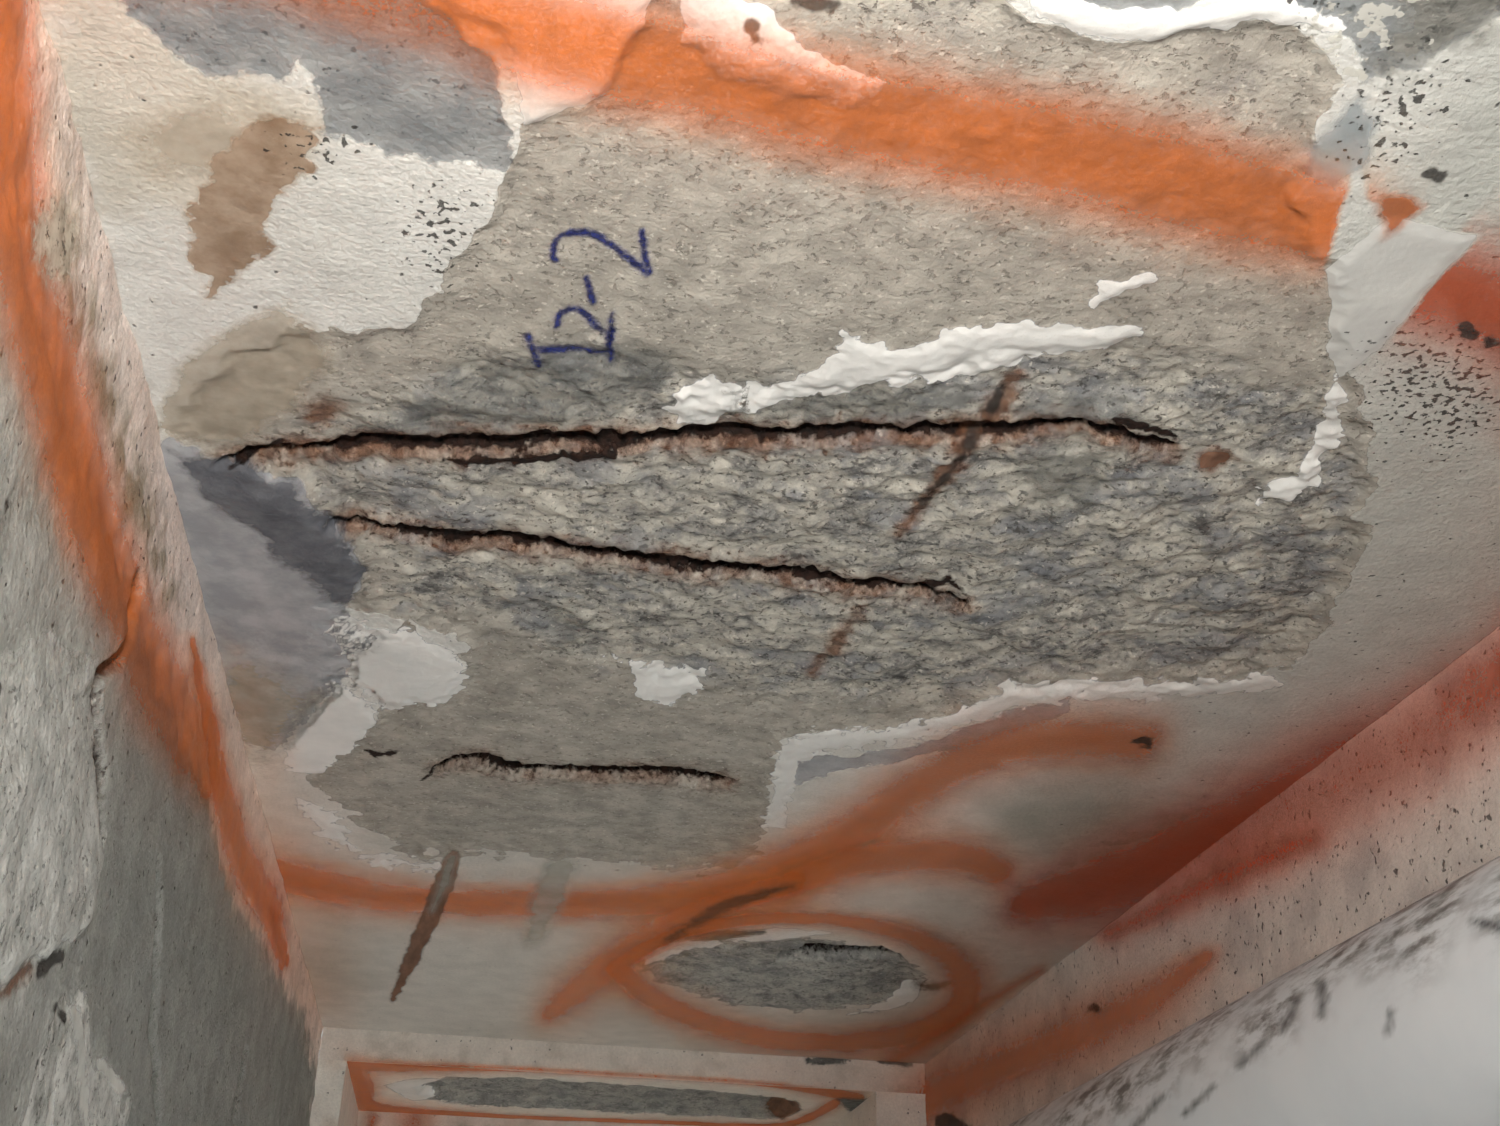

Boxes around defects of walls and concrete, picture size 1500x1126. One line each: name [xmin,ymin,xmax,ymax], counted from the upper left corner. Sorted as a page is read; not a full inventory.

spalling [35,200,78,276]
leakage [154,116,321,298]
crack [217,416,1180,470]
spalling [124,0,1500,876]
rust [898,370,1025,537]
crack [332,510,969,610]
rust [809,612,859,675]
crack [89,652,118,799]
crack [364,749,397,758]
crack [421,752,733,784]
rust [391,851,460,1001]
spalling [636,927,947,1015]